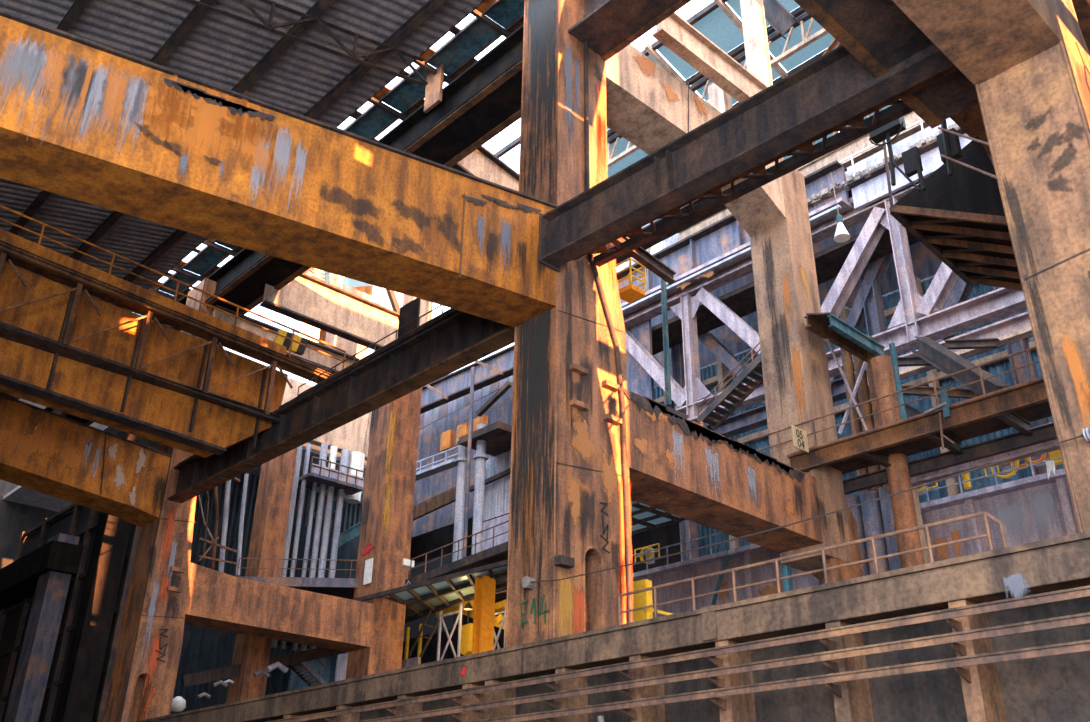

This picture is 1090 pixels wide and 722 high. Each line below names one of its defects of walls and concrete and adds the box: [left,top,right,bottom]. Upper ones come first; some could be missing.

water stain [0,39,147,142]
water stain [251,128,307,206]
rust [608,243,616,290]
rust [1064,337,1090,424]
peeling [108,442,146,507]
rust [383,410,396,537]
peeling [624,389,805,482]